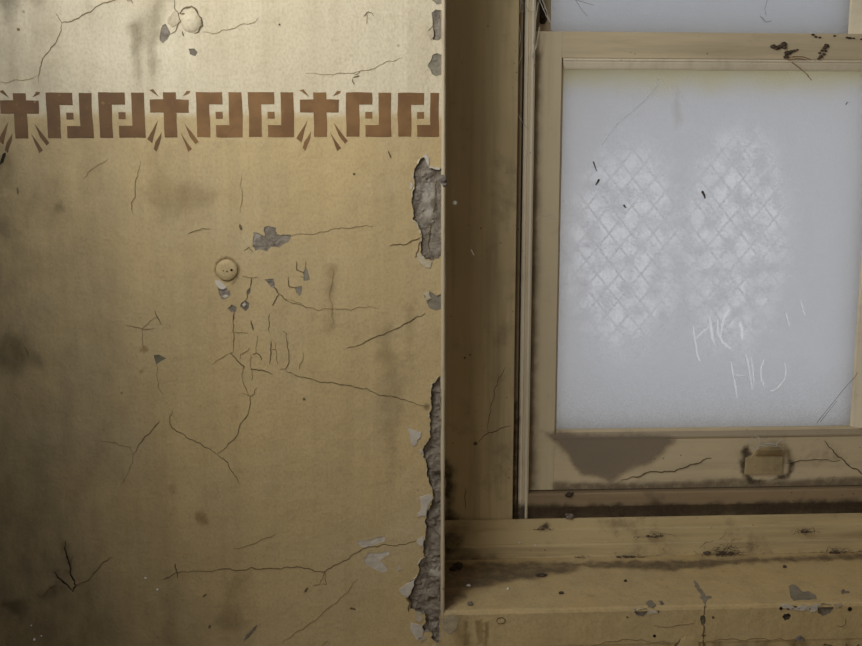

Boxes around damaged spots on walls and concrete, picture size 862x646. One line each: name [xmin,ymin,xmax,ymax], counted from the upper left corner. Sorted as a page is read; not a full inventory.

crack [3,0,133,83]
peeling [427,0,441,40]
peeling [428,53,441,76]
spalling [390,154,441,268]
peeling [252,226,291,252]
crack [289,269,378,323]
crack [103,311,425,483]
spalling [399,376,446,646]
crack [164,535,417,640]
crack [694,580,712,604]
spalling [780,584,849,620]